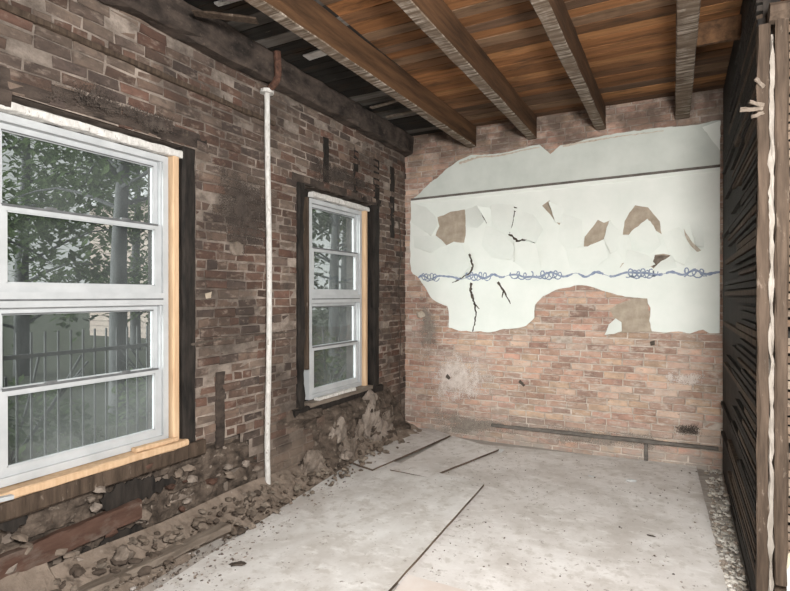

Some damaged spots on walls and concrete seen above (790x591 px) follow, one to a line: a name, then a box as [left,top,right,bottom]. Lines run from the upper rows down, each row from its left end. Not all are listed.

peeling [703,121,721,150]
peeling [411,204,543,277]
peeling [549,202,704,272]
crack [452,254,479,332]
crack [497,281,511,304]
peeling [605,299,655,346]
spalling [0,437,262,568]